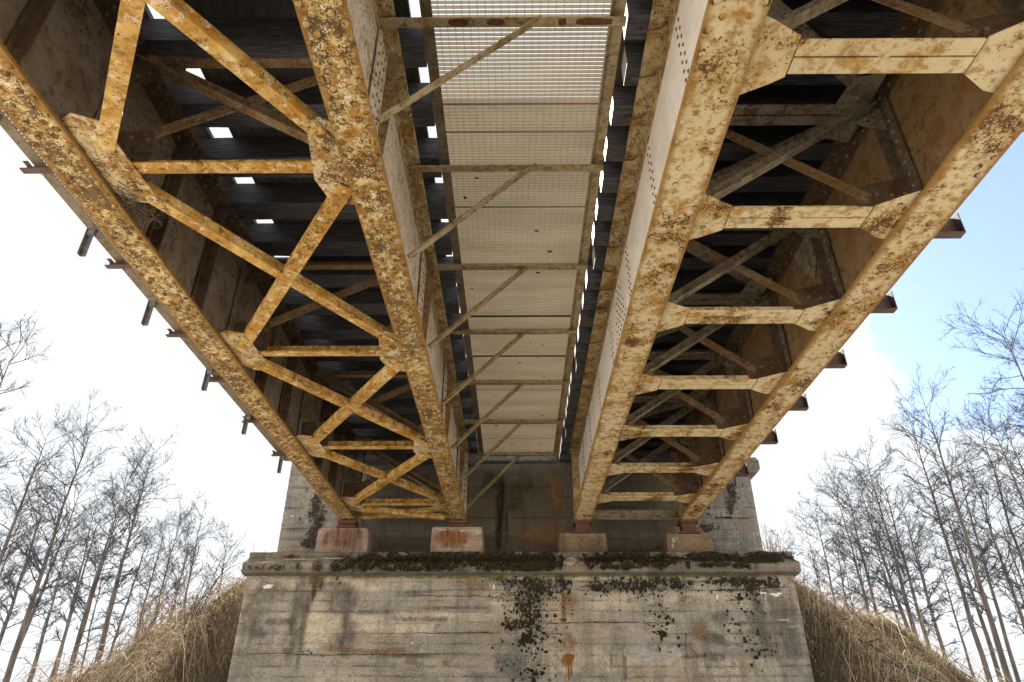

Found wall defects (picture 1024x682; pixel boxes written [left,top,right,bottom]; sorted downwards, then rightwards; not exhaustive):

water stain [242,482,388,654]
corrosion [434,530,466,546]
water stain [496,478,508,548]
corrosion [563,637,575,680]
water stain [482,576,800,682]